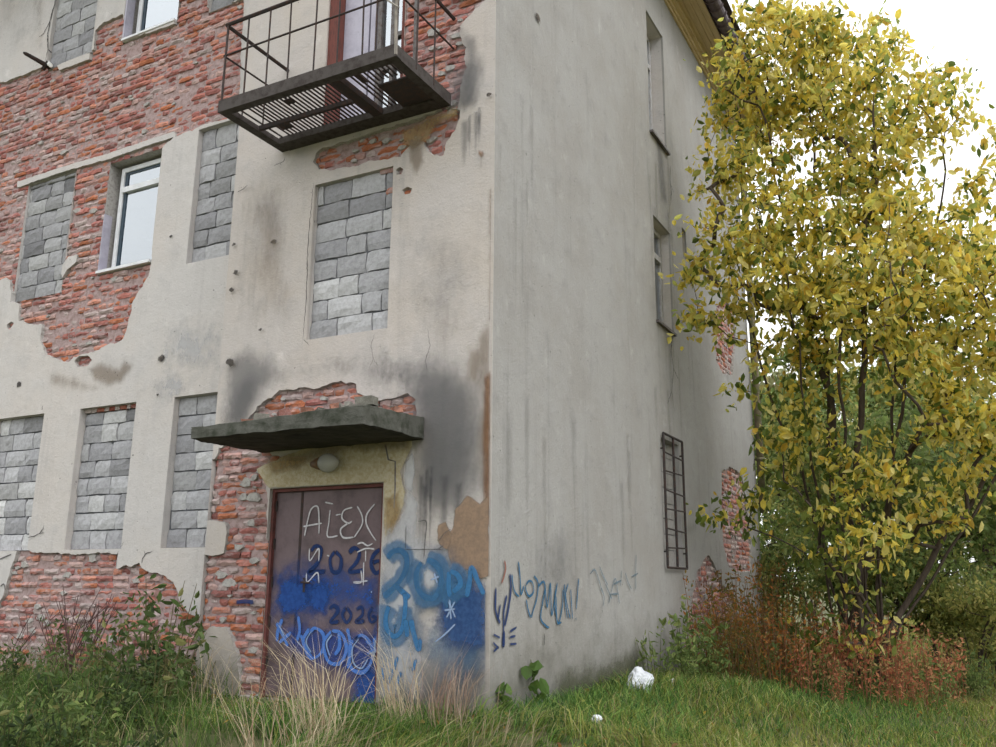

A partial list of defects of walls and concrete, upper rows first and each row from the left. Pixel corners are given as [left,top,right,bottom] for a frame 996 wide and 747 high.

flaking render [313,0,484,175]
flaking render [0,0,244,367]
flaking render [248,381,364,420]
flaking render [378,393,417,416]
flaking render [0,441,412,697]
peeling [437,496,489,578]
flaking render [684,555,737,663]
flaking render [721,466,751,572]